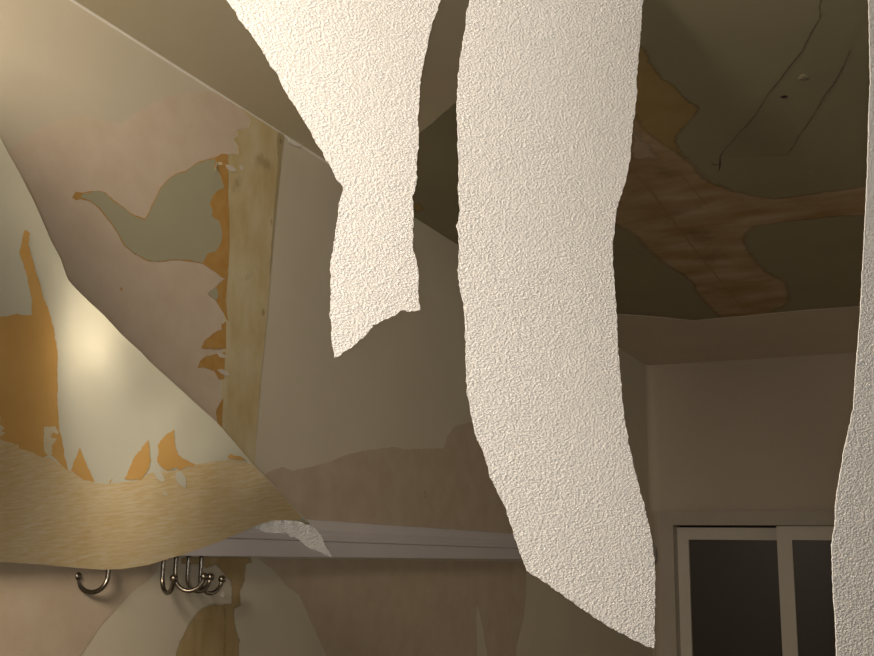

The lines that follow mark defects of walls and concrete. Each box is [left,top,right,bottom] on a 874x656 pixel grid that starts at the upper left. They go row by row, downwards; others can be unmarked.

peeling [0,0,656,656]
crack [712,0,822,170]
peeling [831,0,874,656]